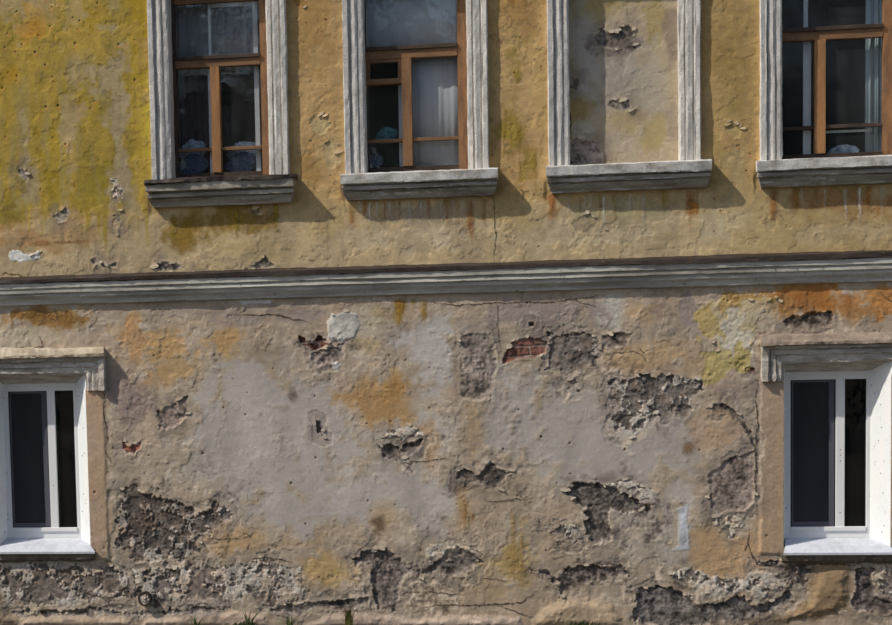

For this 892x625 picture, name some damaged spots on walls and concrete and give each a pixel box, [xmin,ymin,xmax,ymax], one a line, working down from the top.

spalling [594,24,640,52]
peeling [298,309,361,371]
spalling [458,321,632,402]
spalling [379,423,426,462]
spalling [457,460,515,492]
spalling [605,371,758,540]
crack [745,380,759,505]
spalling [0,484,484,622]
spalling [532,563,632,599]
spalling [632,559,814,625]